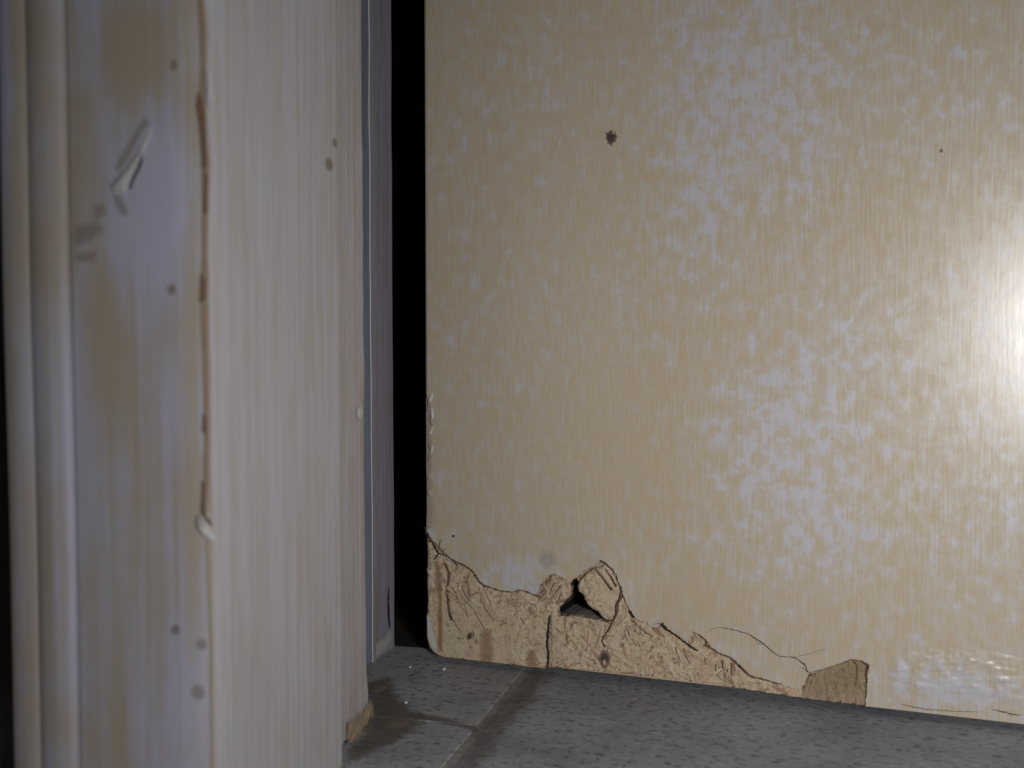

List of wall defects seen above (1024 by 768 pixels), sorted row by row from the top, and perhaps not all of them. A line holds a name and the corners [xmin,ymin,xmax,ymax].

spalling [427,538,870,705]
crack [596,561,823,684]